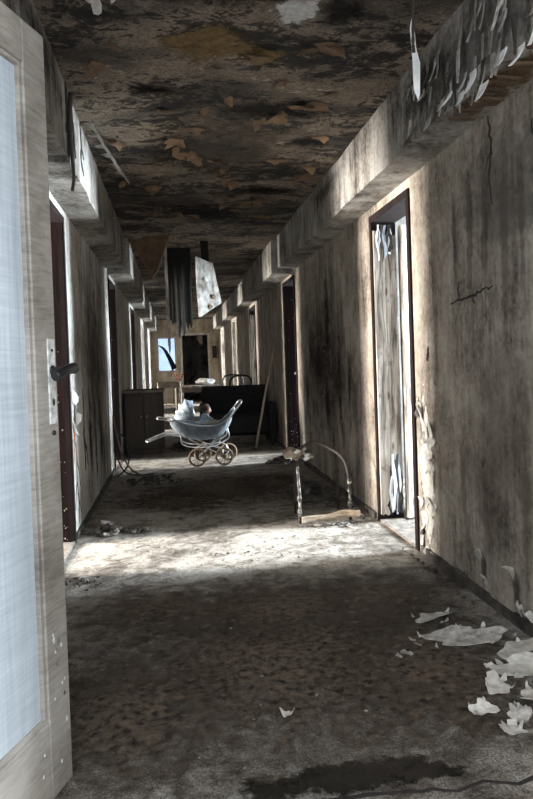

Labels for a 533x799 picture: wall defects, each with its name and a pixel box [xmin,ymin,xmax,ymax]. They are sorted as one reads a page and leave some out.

peeling [85,0,115,15]
peeling [276,0,320,24]
leakage [159,23,284,63]
leakage [131,84,180,95]
leakage [218,101,324,119]
leakage [292,138,322,147]
peeling [80,123,132,188]
leakage [245,186,288,195]
leakage [153,201,245,219]
leakage [84,294,103,476]